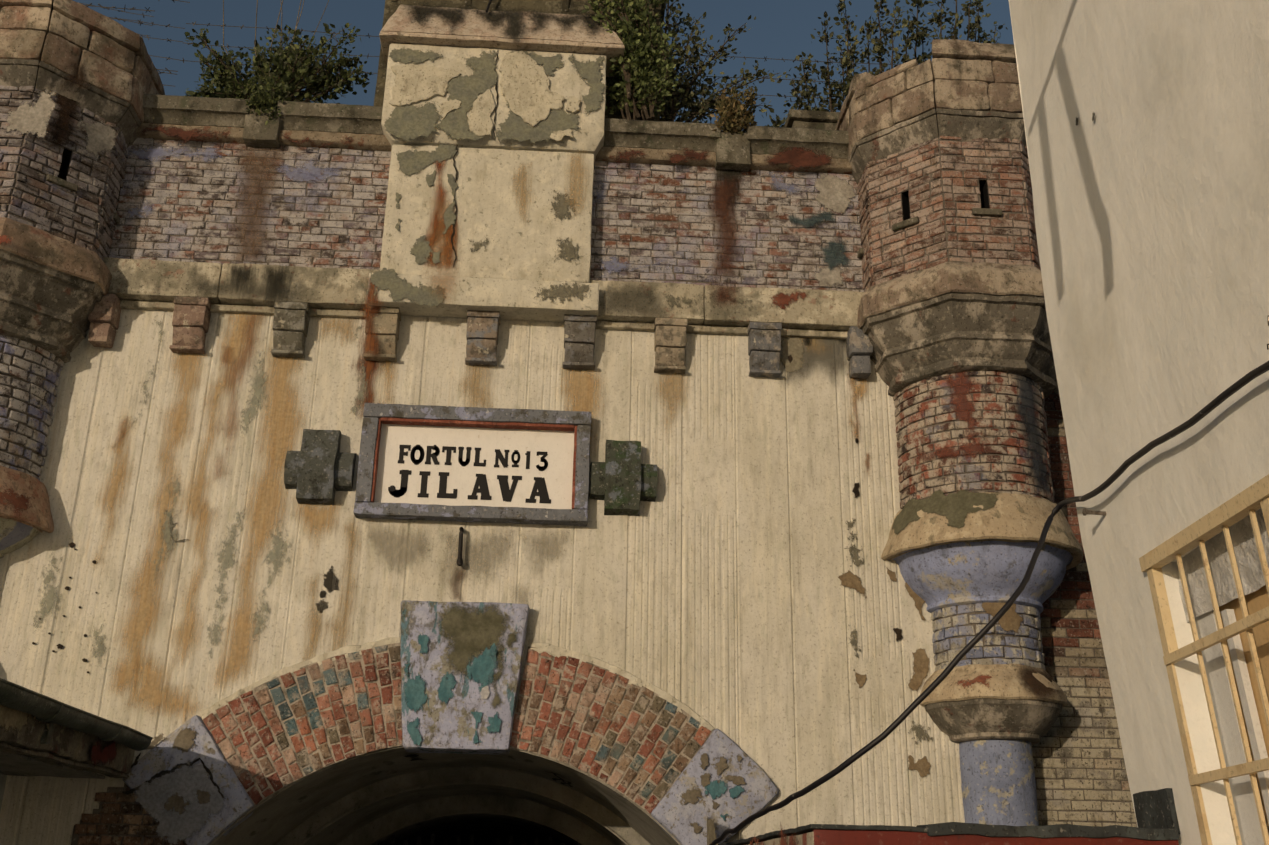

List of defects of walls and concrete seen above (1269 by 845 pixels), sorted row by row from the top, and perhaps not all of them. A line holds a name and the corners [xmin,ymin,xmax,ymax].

peeling [7,89,56,138]
crack [491,50,499,140]
flaking render [384,47,607,234]
water stain [205,151,295,301]
rust [426,161,457,266]
crack [446,144,458,268]
water stain [607,169,756,314]
rust [357,278,392,408]
flaking render [892,489,998,534]
peeling [404,603,517,761]
crack [122,753,224,798]
peeling [680,753,746,845]